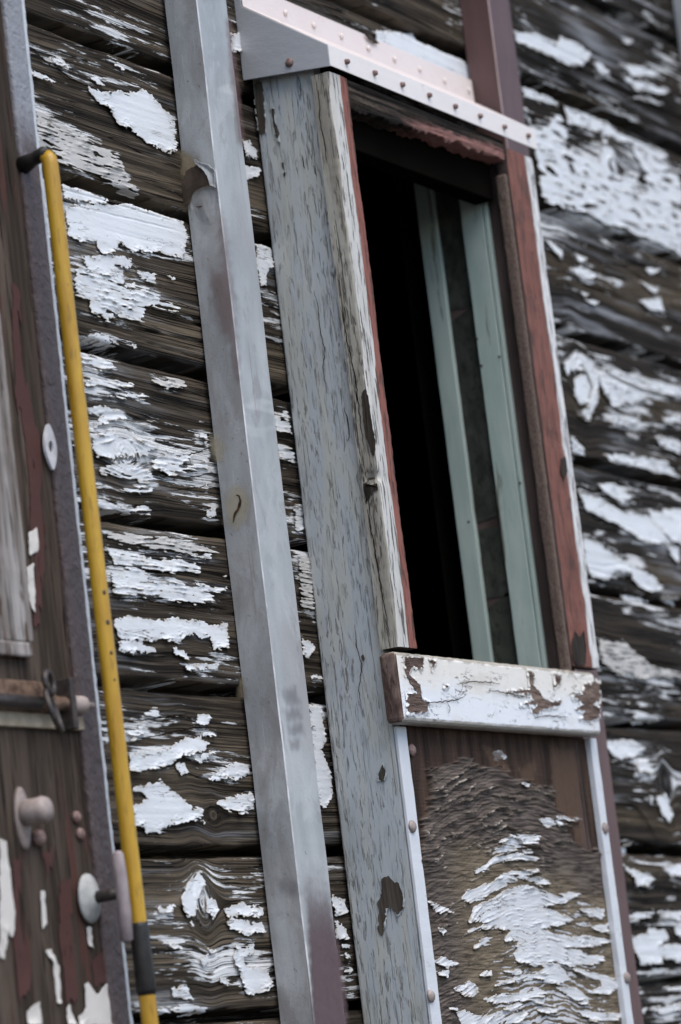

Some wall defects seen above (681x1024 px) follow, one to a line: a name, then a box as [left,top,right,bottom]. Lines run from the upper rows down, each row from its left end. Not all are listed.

peeling [88,77,178,154]
peeling [521,87,681,259]
peeling [36,111,209,516]
peeling [563,350,681,440]
peeling [578,483,681,564]
peeling [107,532,228,606]
peeling [583,537,678,607]
peeling [114,615,230,672]
peeling [126,707,217,834]
peeling [157,871,274,996]
peeling [434,815,621,1024]
peeling [629,909,681,966]